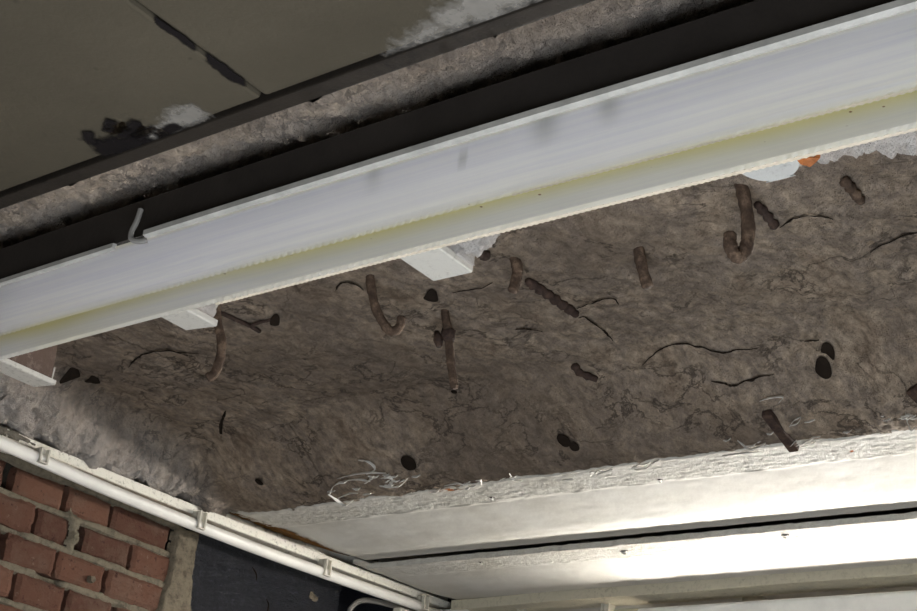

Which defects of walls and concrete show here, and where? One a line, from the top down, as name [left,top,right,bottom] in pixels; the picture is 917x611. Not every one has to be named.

rust [797,155,820,167]
spalling [839,176,865,205]
spalling [723,183,780,264]
crack [780,215,833,228]
crack [870,232,917,253]
spalling [508,257,579,318]
spalling [205,304,227,382]
spalling [433,309,458,390]
crack [643,343,758,365]
spalling [570,363,598,382]
crack [711,374,774,387]
peeling [327,460,421,507]